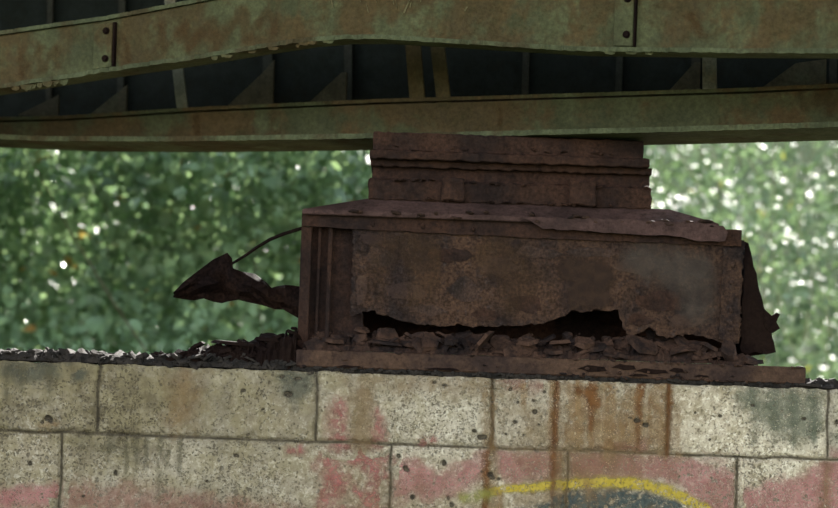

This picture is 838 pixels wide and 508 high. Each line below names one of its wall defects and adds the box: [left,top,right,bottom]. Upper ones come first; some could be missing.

corrosion [551,381,560,495]
corrosion [576,383,600,429]